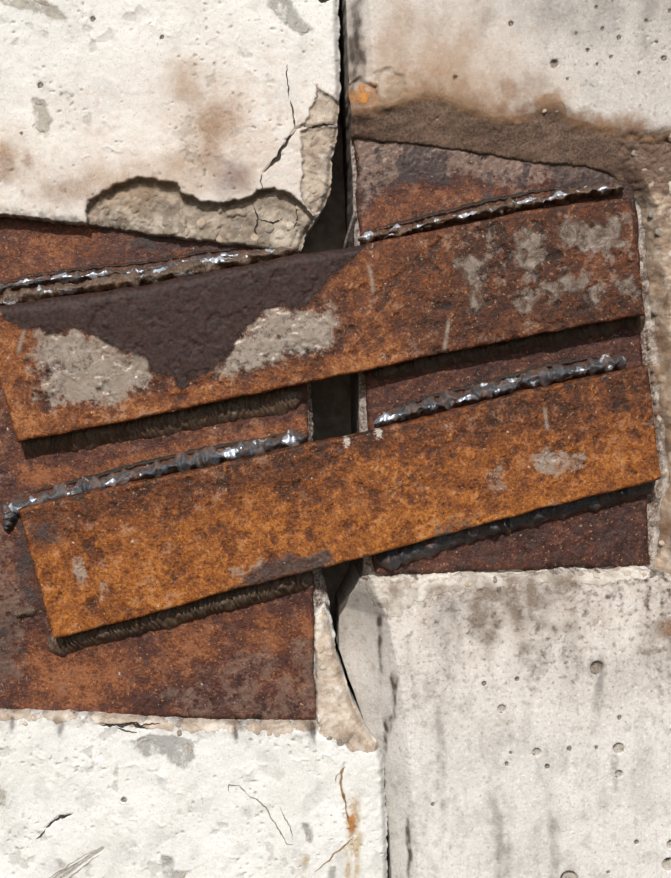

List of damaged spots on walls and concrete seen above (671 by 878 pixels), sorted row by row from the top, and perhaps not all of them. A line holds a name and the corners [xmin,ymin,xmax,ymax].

spalling [86,85,339,252]
crack [253,70,334,244]
spalling [0,604,379,767]
crack [36,814,72,839]
crack [228,784,293,845]
crack [316,763,355,871]
rust [346,801,361,877]